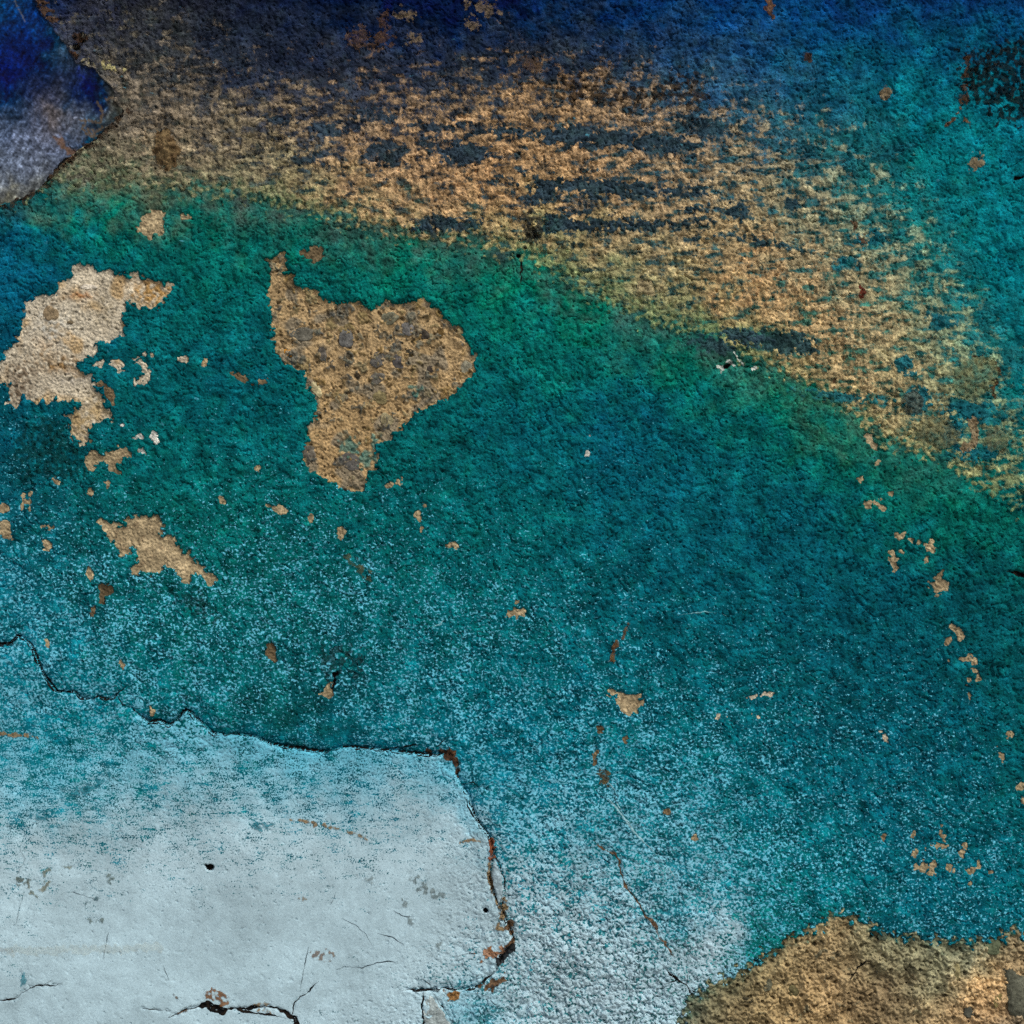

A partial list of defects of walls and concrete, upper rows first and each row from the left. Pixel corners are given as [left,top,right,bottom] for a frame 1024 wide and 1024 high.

peeling [0,0,1024,512]
spalling [97,514,218,586]
peeling [888,531,936,573]
peeling [927,569,949,597]
peeling [944,624,965,646]
peeling [947,653,982,700]
crack [0,634,514,1024]
spalling [495,943,515,967]
spalling [677,907,1024,1024]